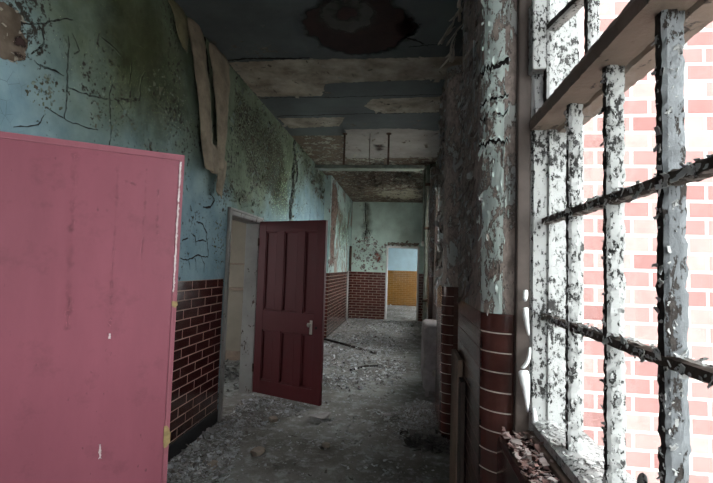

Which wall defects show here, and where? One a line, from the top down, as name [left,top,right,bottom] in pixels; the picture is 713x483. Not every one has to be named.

spalling [0,2,28,64]
crack [13,17,138,146]
leakage [107,0,180,111]
crack [180,195,216,272]
crack [286,138,300,221]
peeling [168,0,464,292]
leakage [301,0,419,55]
crack [478,51,509,161]
peeling [477,0,513,316]
peeling [601,218,620,263]
peeling [542,106,713,231]
peeling [519,238,713,483]